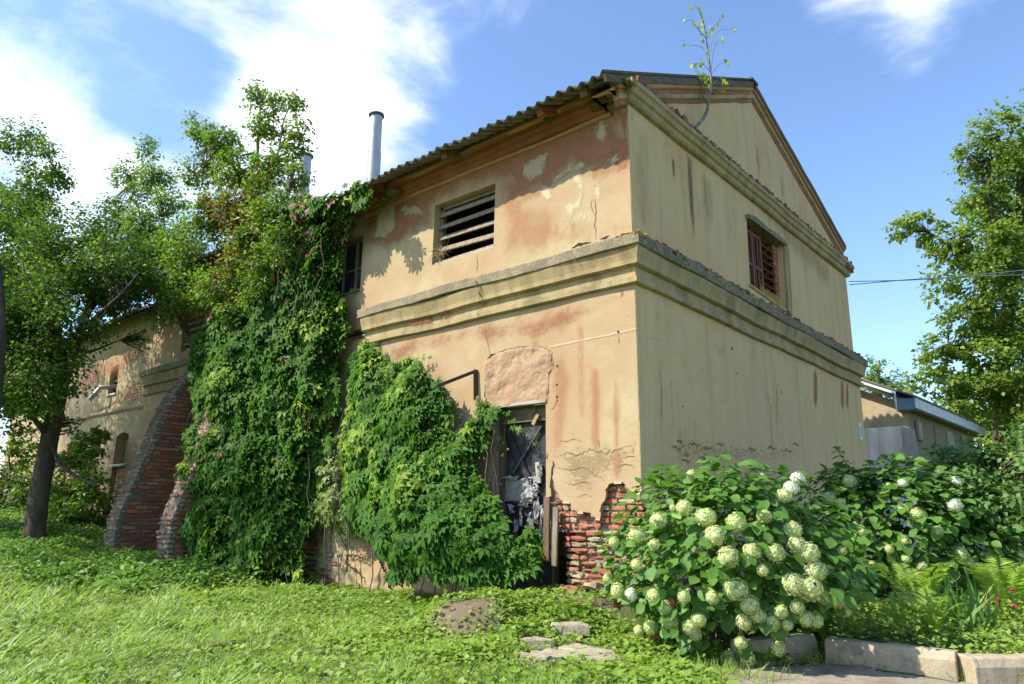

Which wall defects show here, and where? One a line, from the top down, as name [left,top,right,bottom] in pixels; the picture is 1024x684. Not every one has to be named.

peeling [368,117,626,244]
crack [551,438,637,498]
spalling [549,477,656,599]